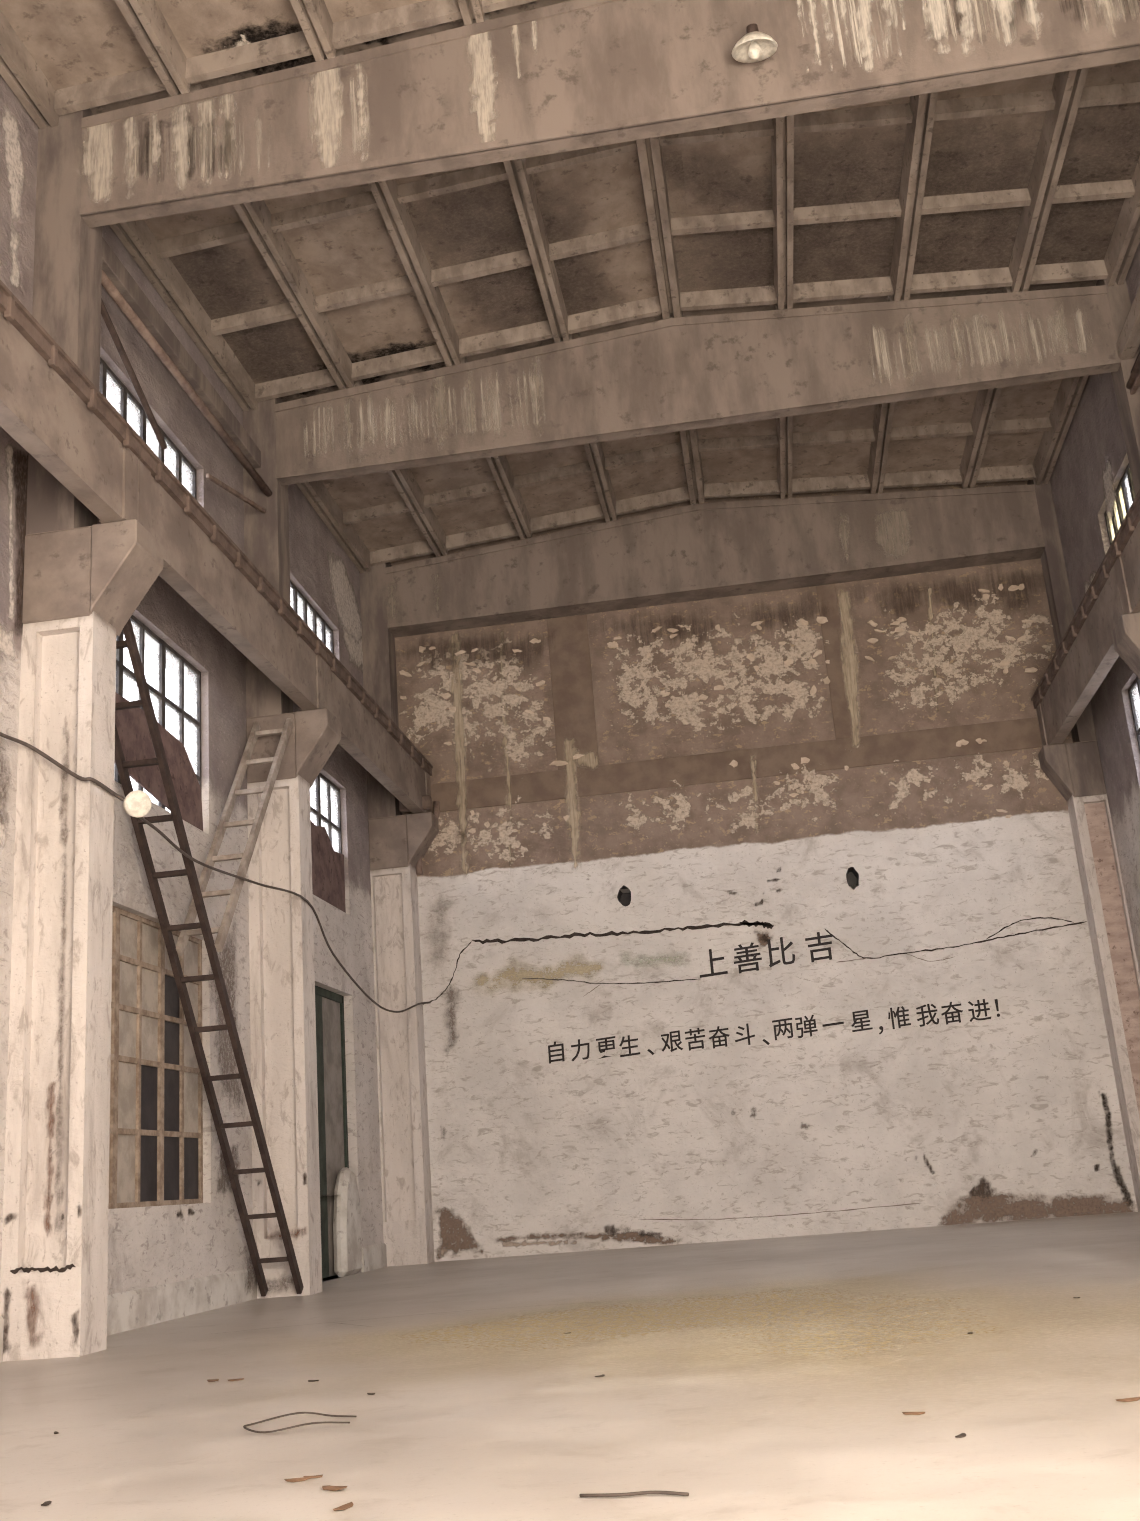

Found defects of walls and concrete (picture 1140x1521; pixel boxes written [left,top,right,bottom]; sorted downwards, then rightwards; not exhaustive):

peeling [399,637,584,772]
peeling [607,608,835,738]
peeling [865,584,1053,712]
peeling [616,749,853,838]
peeling [875,738,1049,818]
spalling [941,1093,1133,1226]
spalling [437,1208,676,1259]